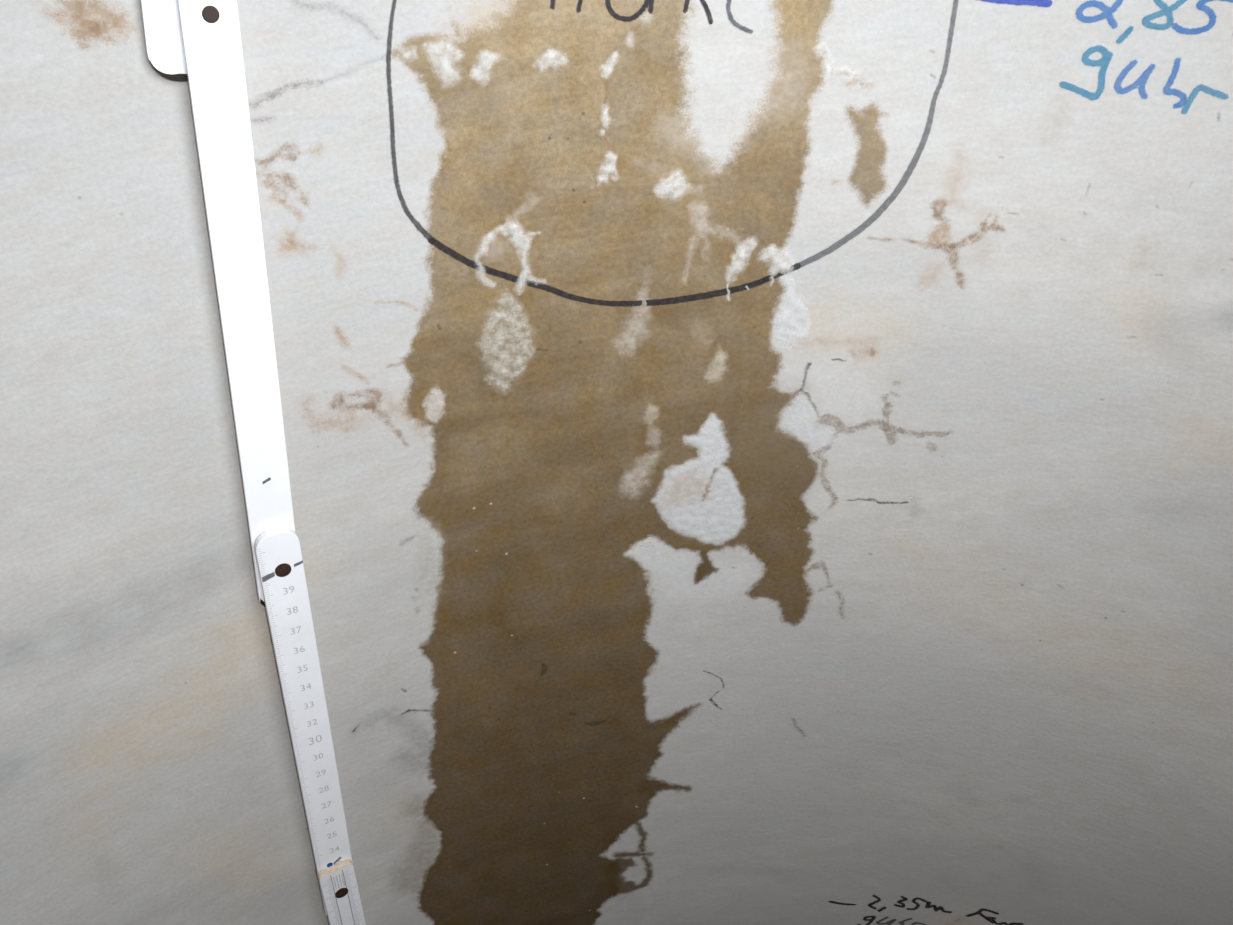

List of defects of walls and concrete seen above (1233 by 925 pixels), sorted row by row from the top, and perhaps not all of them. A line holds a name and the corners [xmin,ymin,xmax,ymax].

leakage [392,0,855,925]
crack [793,363,949,505]
crack [807,563,843,616]